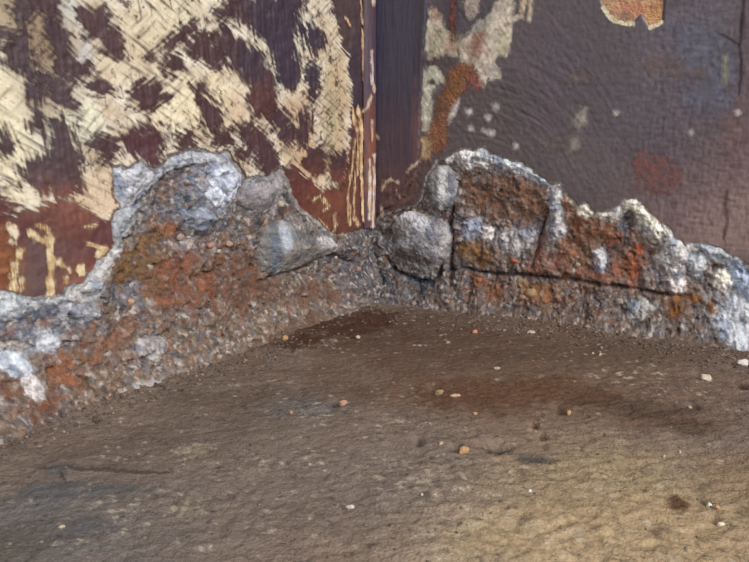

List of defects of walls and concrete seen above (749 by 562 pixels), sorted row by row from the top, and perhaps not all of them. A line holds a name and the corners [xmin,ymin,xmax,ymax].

corrosion [378,59,484,212]
corrosion [111,217,279,318]
peeling [0,0,749,445]
crack [389,206,686,304]
corrosion [528,216,651,288]